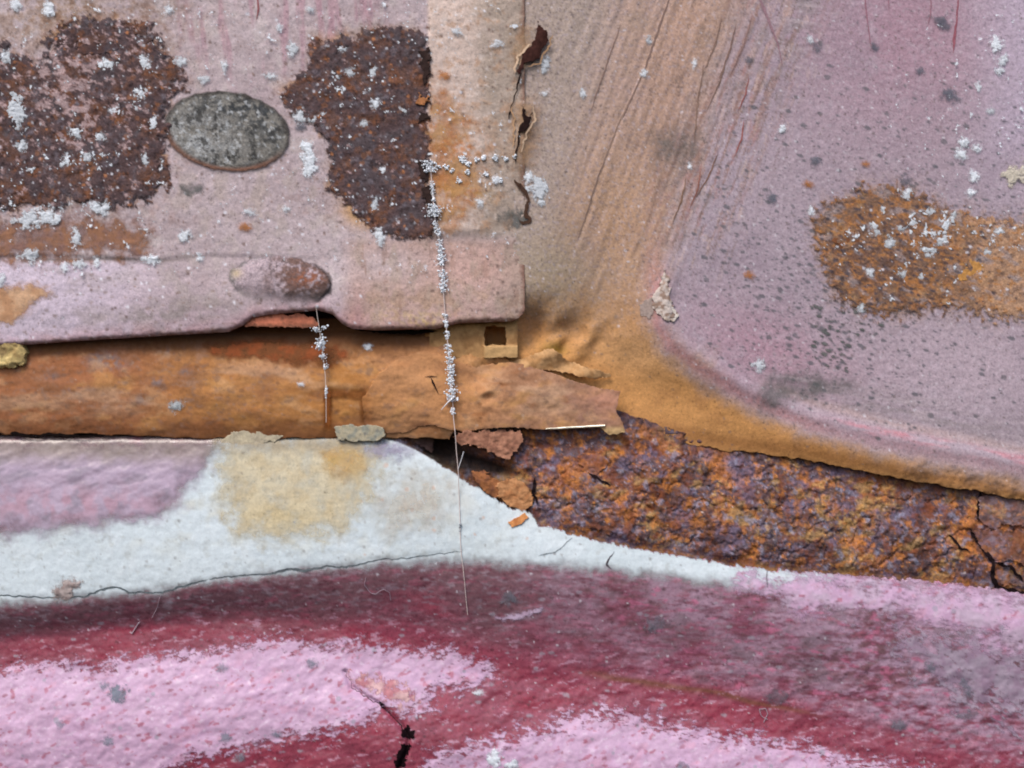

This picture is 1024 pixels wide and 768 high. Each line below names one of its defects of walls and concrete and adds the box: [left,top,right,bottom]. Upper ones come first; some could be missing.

corrosion [0,13,191,265]
corrosion [280,25,478,241]
corrosion [207,339,347,367]
corrosion [324,390,366,427]
peeling [639,269,679,322]
corrosion [810,180,1024,325]
crack [0,551,458,598]
peeling [0,424,1024,739]
corrosion [373,410,1024,594]
crack [346,672,415,768]